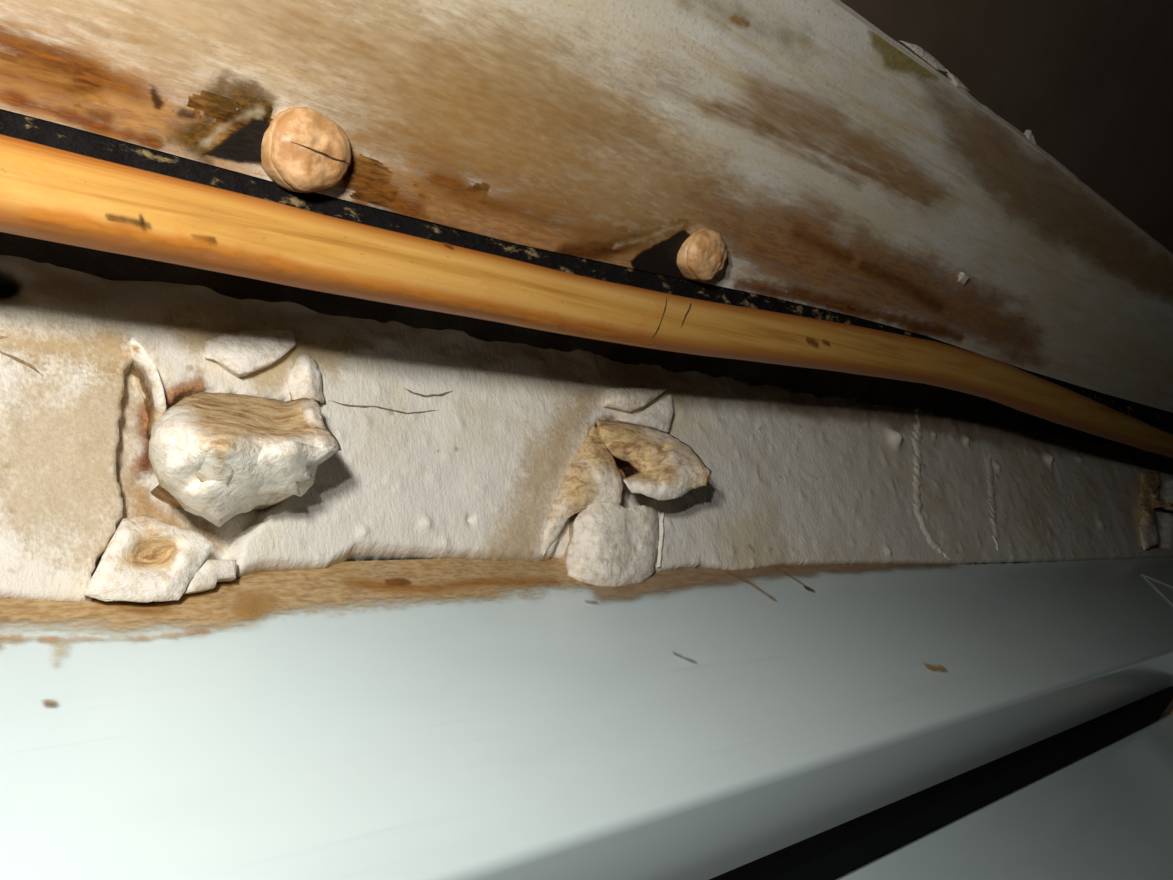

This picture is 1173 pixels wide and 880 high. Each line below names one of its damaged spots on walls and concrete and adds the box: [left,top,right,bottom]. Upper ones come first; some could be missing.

leakage [872,32,937,78]
spalling [204,109,270,163]
leakage [12,0,724,242]
leakage [749,89,939,201]
leakage [28,209,237,256]
leakage [937,99,1173,299]
leakage [327,274,657,346]
leakage [0,330,127,371]